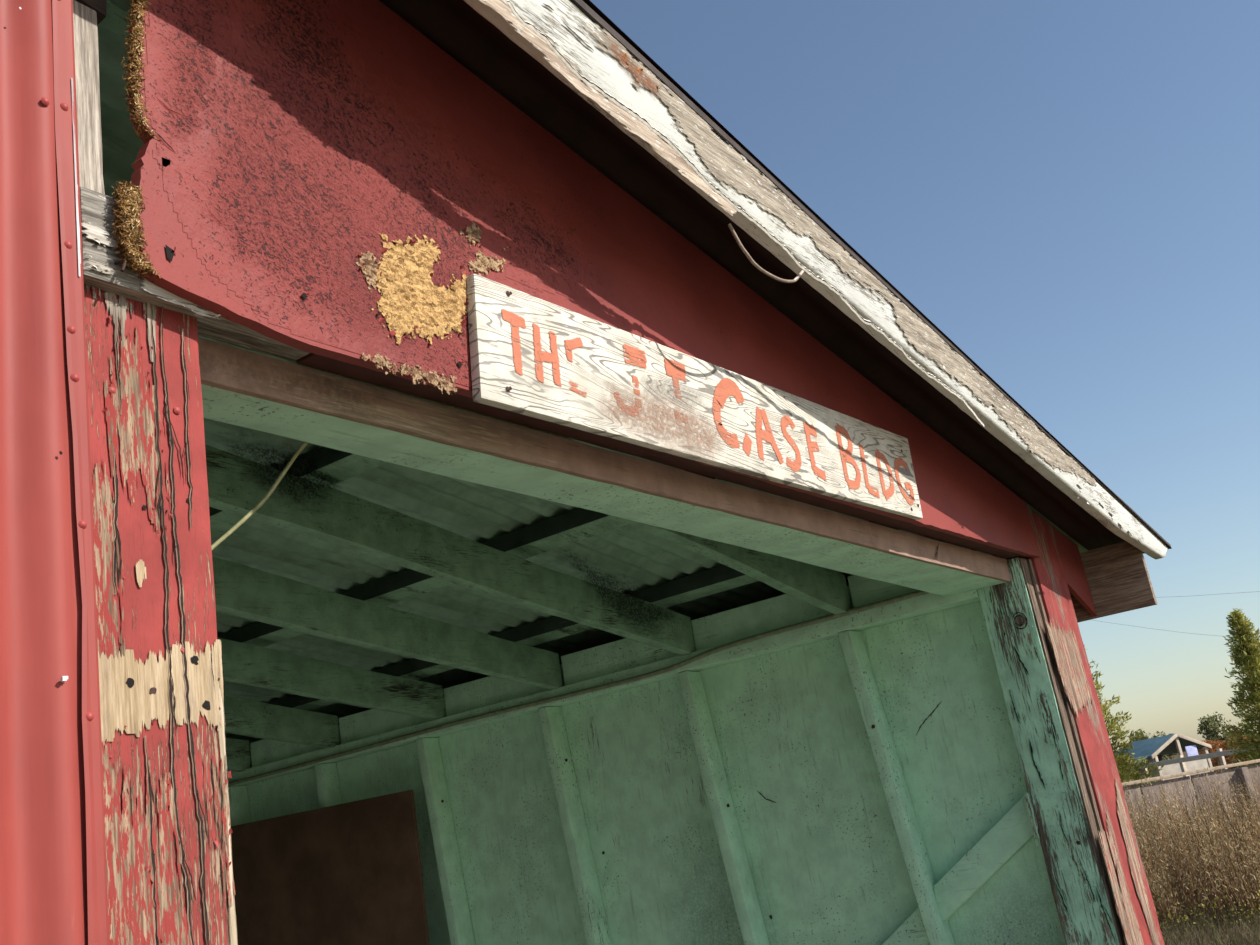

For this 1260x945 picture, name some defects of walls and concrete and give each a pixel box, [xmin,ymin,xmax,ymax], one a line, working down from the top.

spalling [355,220,508,345]
peeling [479,0,1141,544]
crack [114,323,122,415]
spalling [361,352,457,394]
crack [113,453,122,595]
peeling [71,78,224,945]
crack [145,303,209,945]
peeling [1010,587,1094,718]
peeling [1036,685,1083,816]
peeling [204,755,235,907]
peeling [1053,810,1151,945]